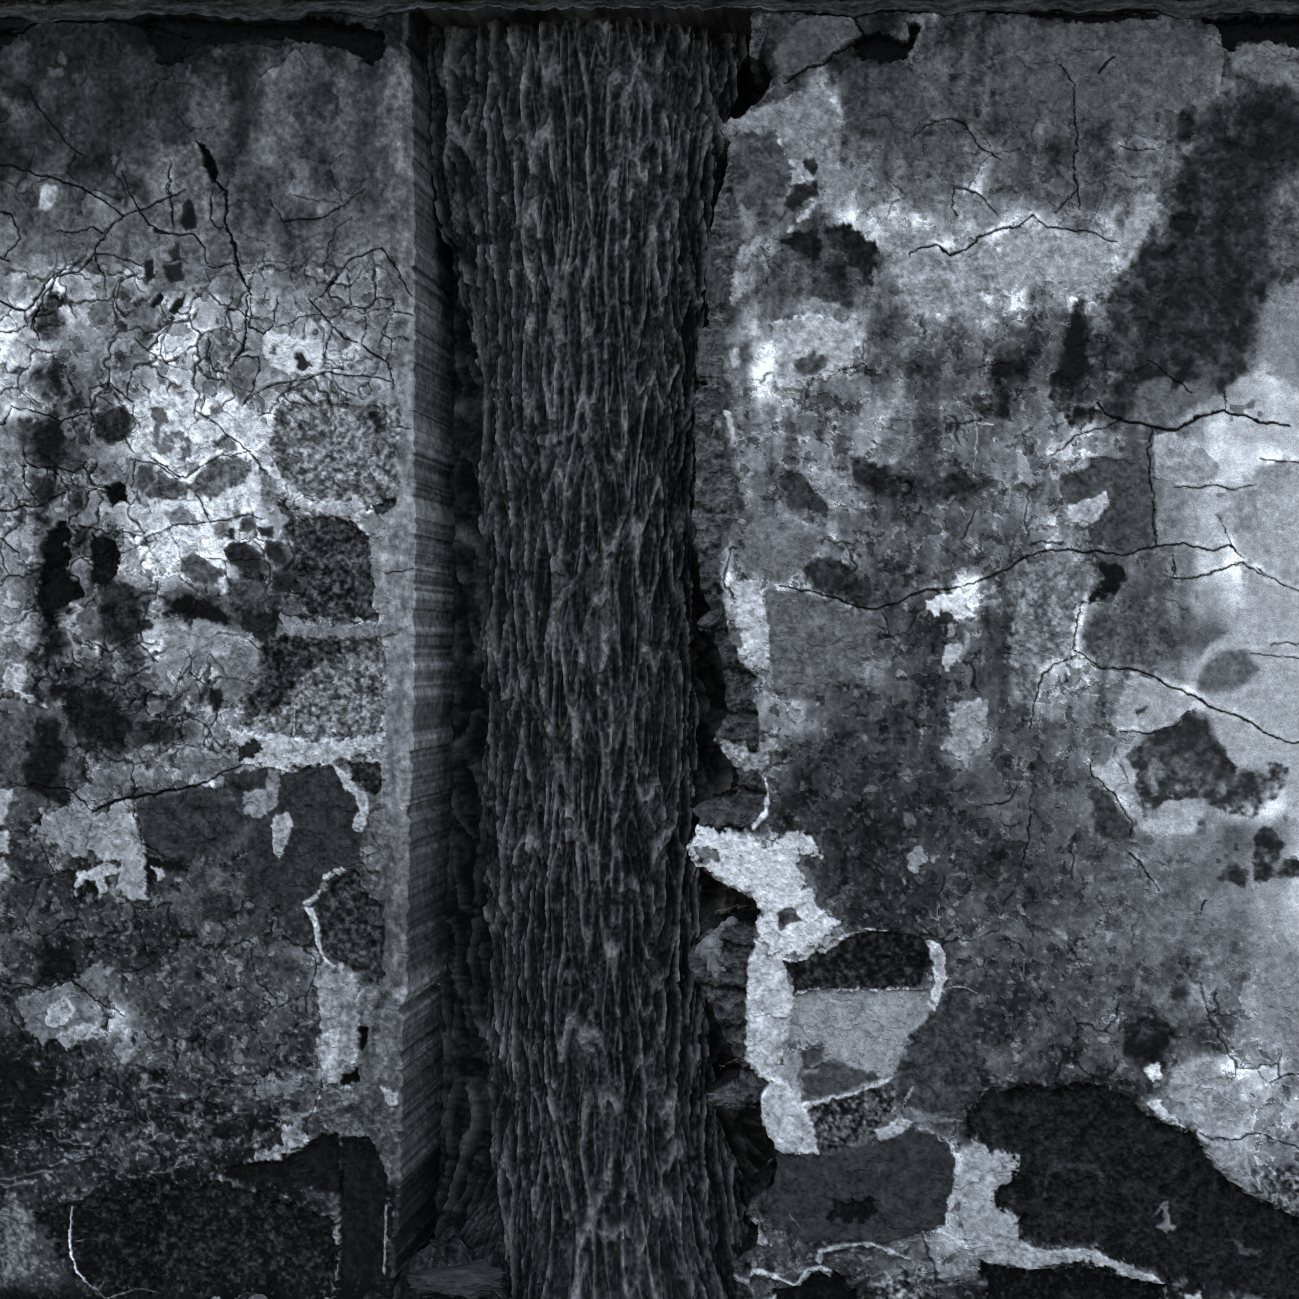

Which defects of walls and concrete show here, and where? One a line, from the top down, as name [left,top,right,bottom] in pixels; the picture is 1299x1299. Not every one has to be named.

crack [10,142,409,405]
peeling [729,272,748,308]
crack [910,176,1079,257]
damp [1048,85,1299,429]
damp [21,359,85,790]
crack [130,410,271,487]
peeling [729,579,772,671]
crack [787,392,1295,610]
spalling [221,400,404,1092]
damp [1128,711,1299,887]
spalling [686,733,1299,1299]
spalling [36,1120,389,1296]